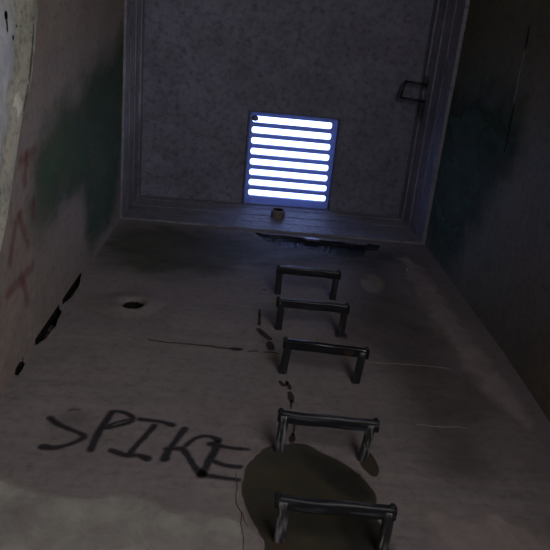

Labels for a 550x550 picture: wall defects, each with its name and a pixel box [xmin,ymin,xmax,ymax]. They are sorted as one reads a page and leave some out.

spalling [255,232,380,258]
crack [148,339,279,354]
water stain [242,425,381,550]